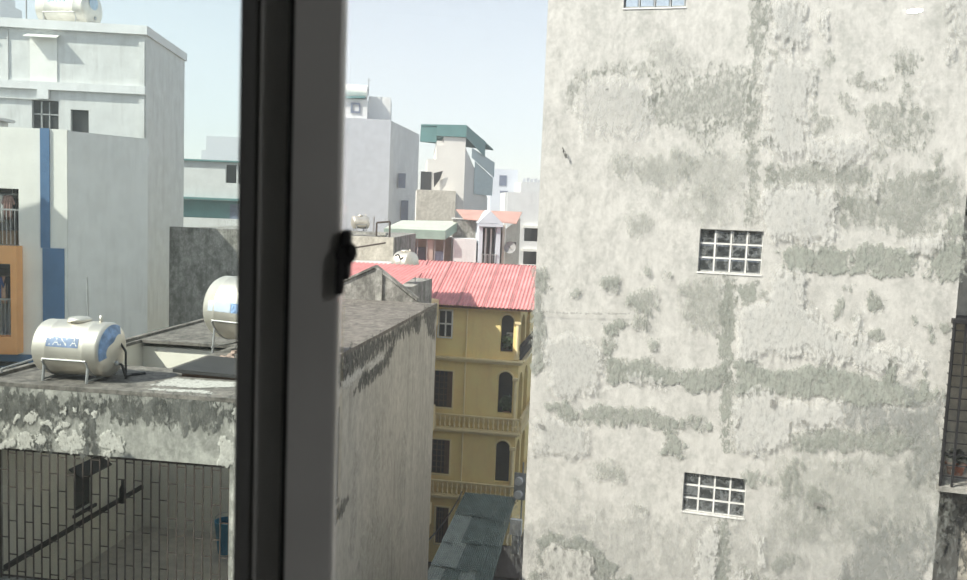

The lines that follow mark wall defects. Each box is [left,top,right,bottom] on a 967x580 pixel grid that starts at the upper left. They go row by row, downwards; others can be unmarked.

water stain [339,303,438,395]
peeling [148,378,236,394]
peeling [338,354,384,398]
peeling [0,406,98,455]
peeling [99,429,125,458]
water stain [0,386,236,460]
peeling [216,408,235,536]